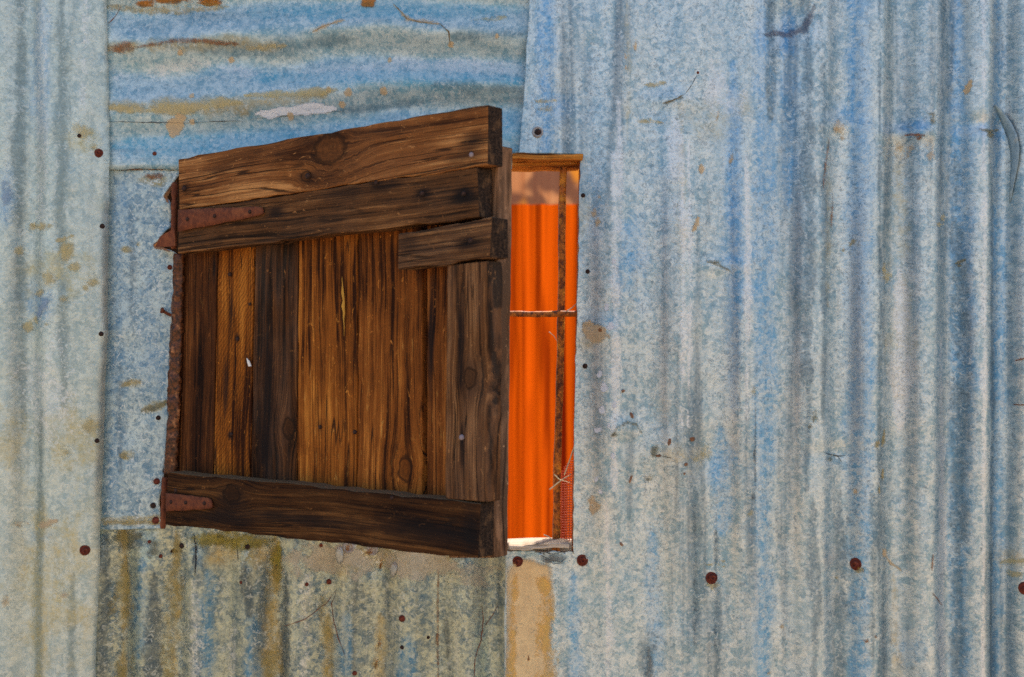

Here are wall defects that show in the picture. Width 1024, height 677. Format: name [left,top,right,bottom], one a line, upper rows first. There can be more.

corrosion [110,87,335,115]
leakage [192,531,282,583]
corrosion [505,560,559,677]